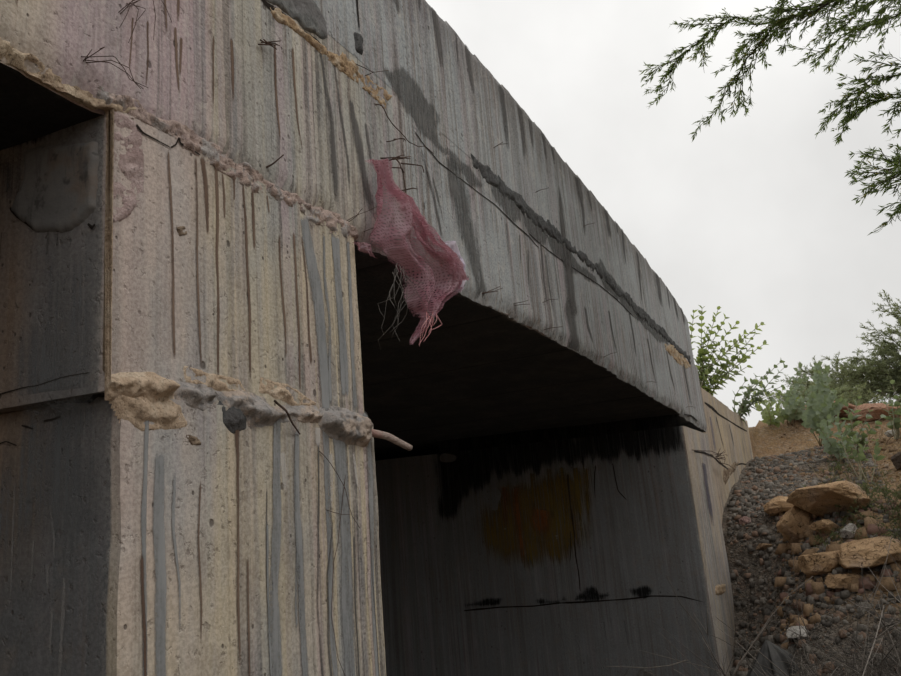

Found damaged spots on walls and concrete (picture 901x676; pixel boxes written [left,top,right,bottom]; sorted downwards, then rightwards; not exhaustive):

water stain [164,0,183,90]
spalling [270,7,392,108]
crack [416,133,632,315]
crack [0,372,105,446]
crack [464,474,701,611]